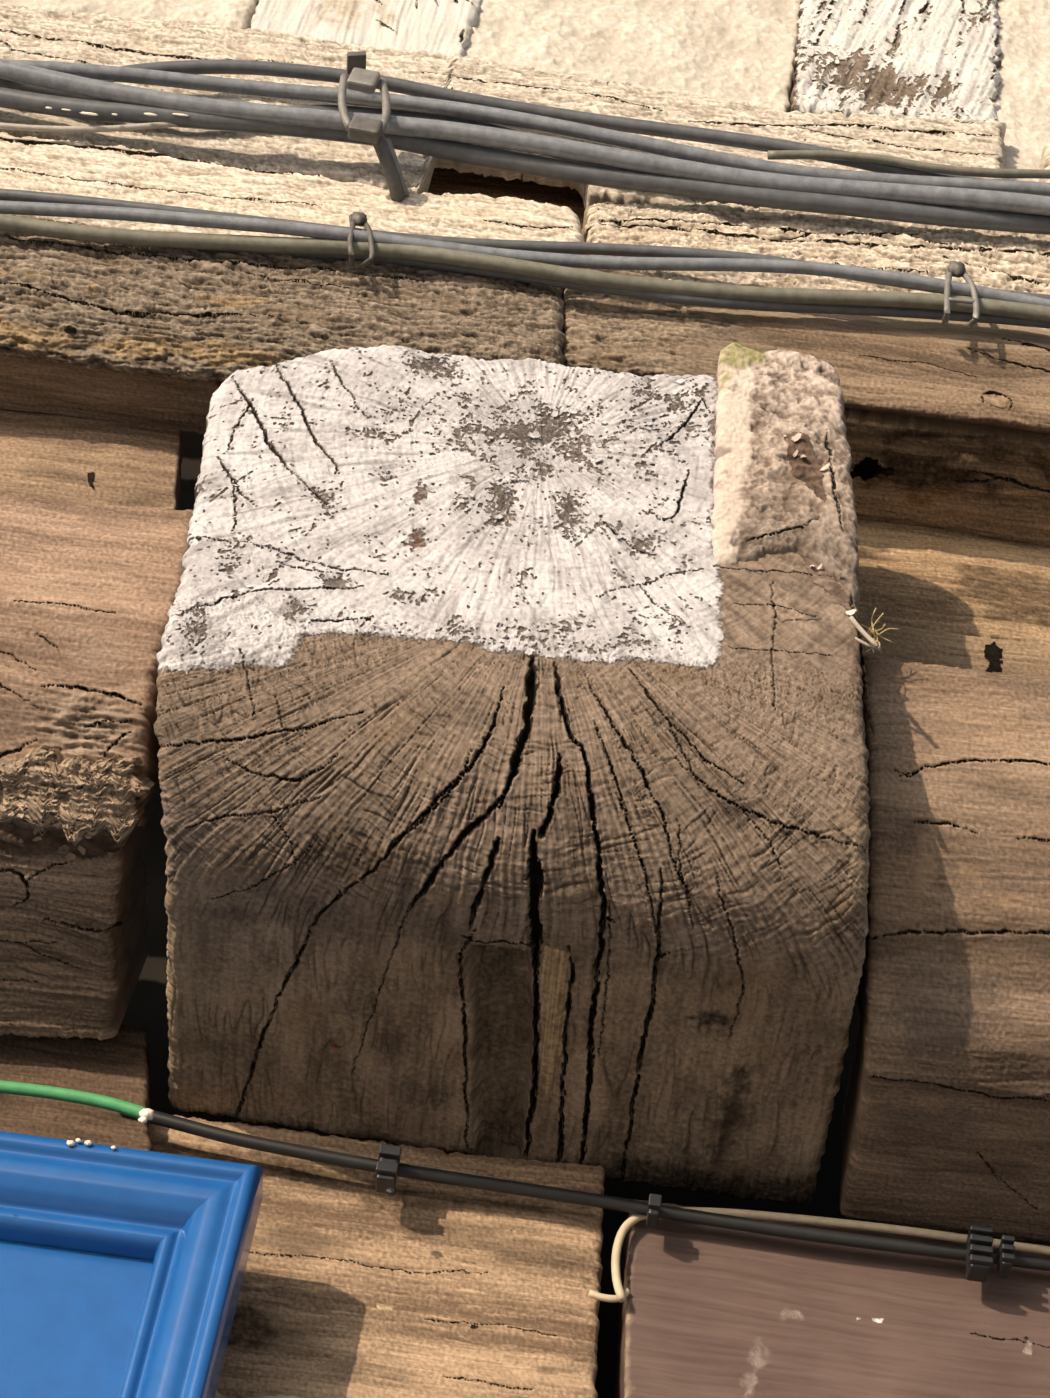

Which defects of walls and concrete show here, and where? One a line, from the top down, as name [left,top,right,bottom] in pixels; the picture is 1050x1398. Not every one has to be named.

crack [422,72,997,155]
spalling [0,314,282,366]
peeling [411,354,459,385]
peeling [458,408,603,473]
crack [182,365,388,624]
peeling [410,524,425,547]
peeling [485,474,515,526]
crack [719,429,876,736]
crack [0,600,141,757]
crack [165,653,364,900]
spalling [0,822,124,861]
crack [235,657,854,1180]